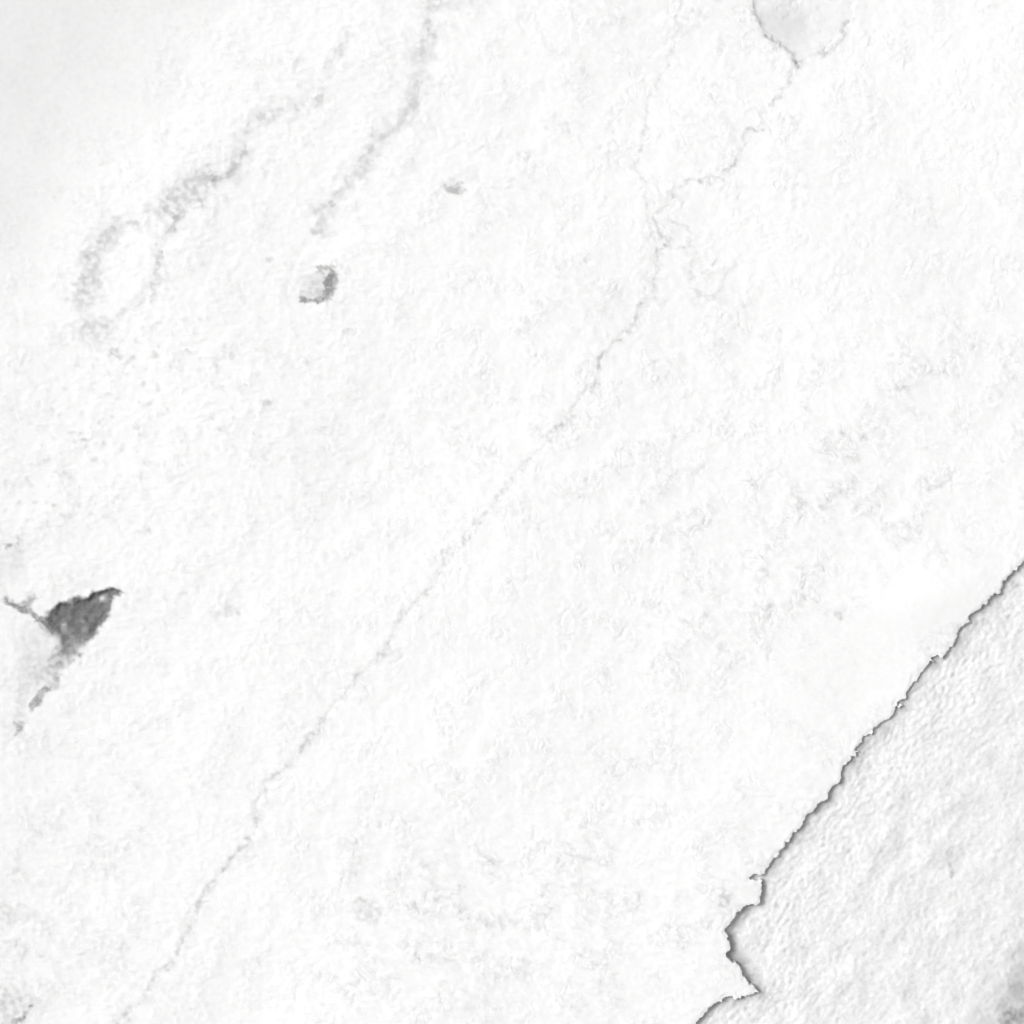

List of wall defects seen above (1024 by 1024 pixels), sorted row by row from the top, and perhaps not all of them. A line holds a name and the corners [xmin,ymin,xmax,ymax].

spalling [300,269,337,303]
spalling [6,588,121,647]
spalling [696,561,1024,1024]